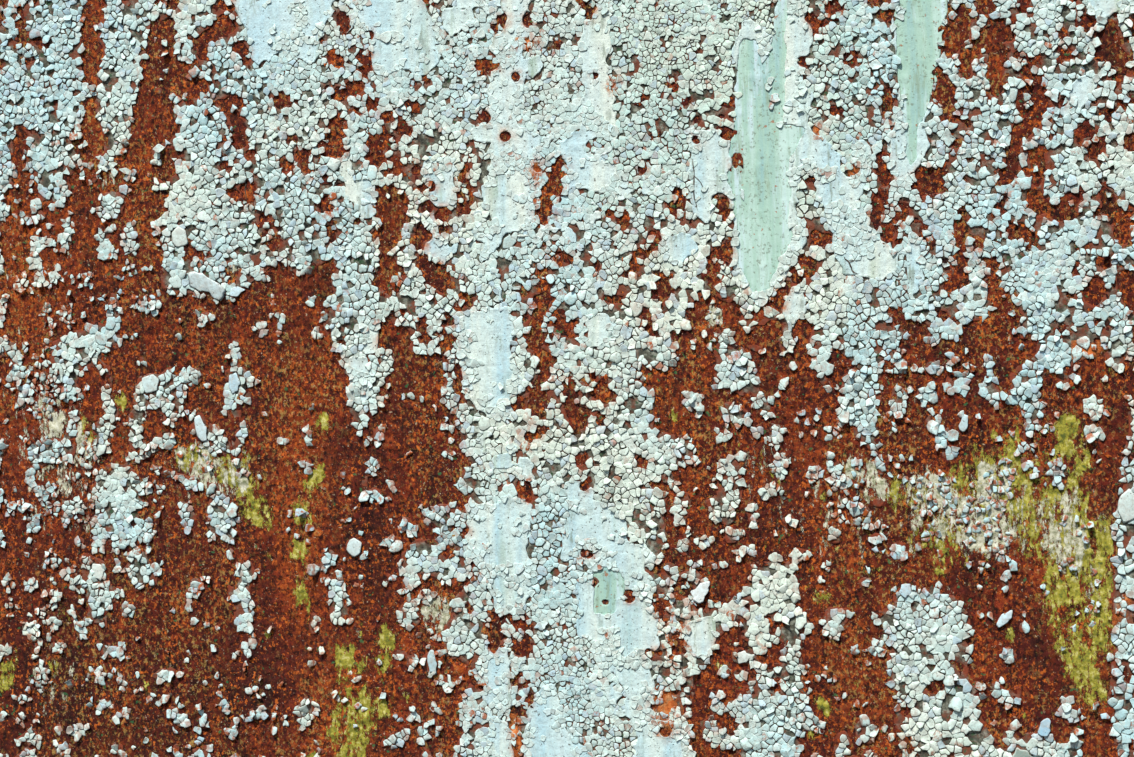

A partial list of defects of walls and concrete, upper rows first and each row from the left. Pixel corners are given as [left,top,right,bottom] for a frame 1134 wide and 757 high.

rust [515,14,563,51]
peeling [13,210,94,294]
rust [530,157,567,228]
peeling [0,289,262,757]
rust [0,0,537,757]
rust [511,249,618,443]
rust [569,452,592,491]
peeling [705,308,791,501]
peeling [804,451,908,561]
rust [602,0,1134,757]
peeling [883,381,968,460]
peeling [306,531,368,667]